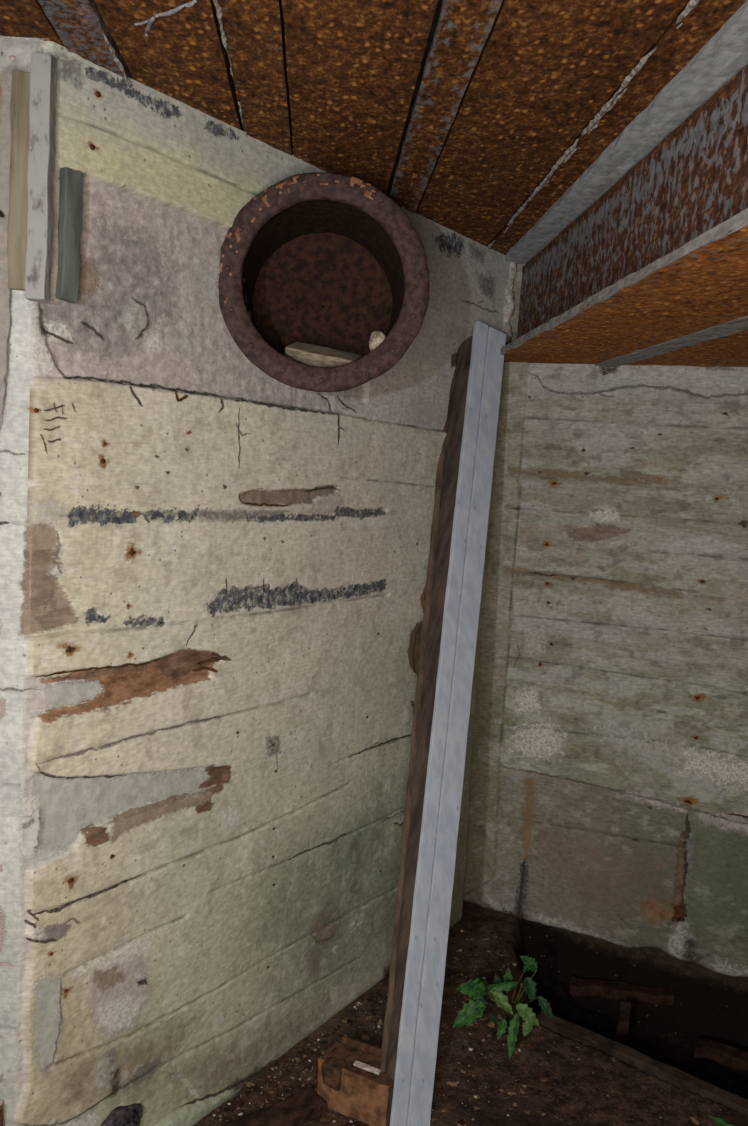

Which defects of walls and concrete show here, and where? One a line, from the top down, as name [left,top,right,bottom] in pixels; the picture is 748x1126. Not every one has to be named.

corrosion [220,174,375,276]
crack [529,373,748,399]
spalling [239,485,344,518]
spalling [18,500,78,635]
spalling [36,648,231,723]
peeling [502,684,748,836]
spalling [17,764,243,864]